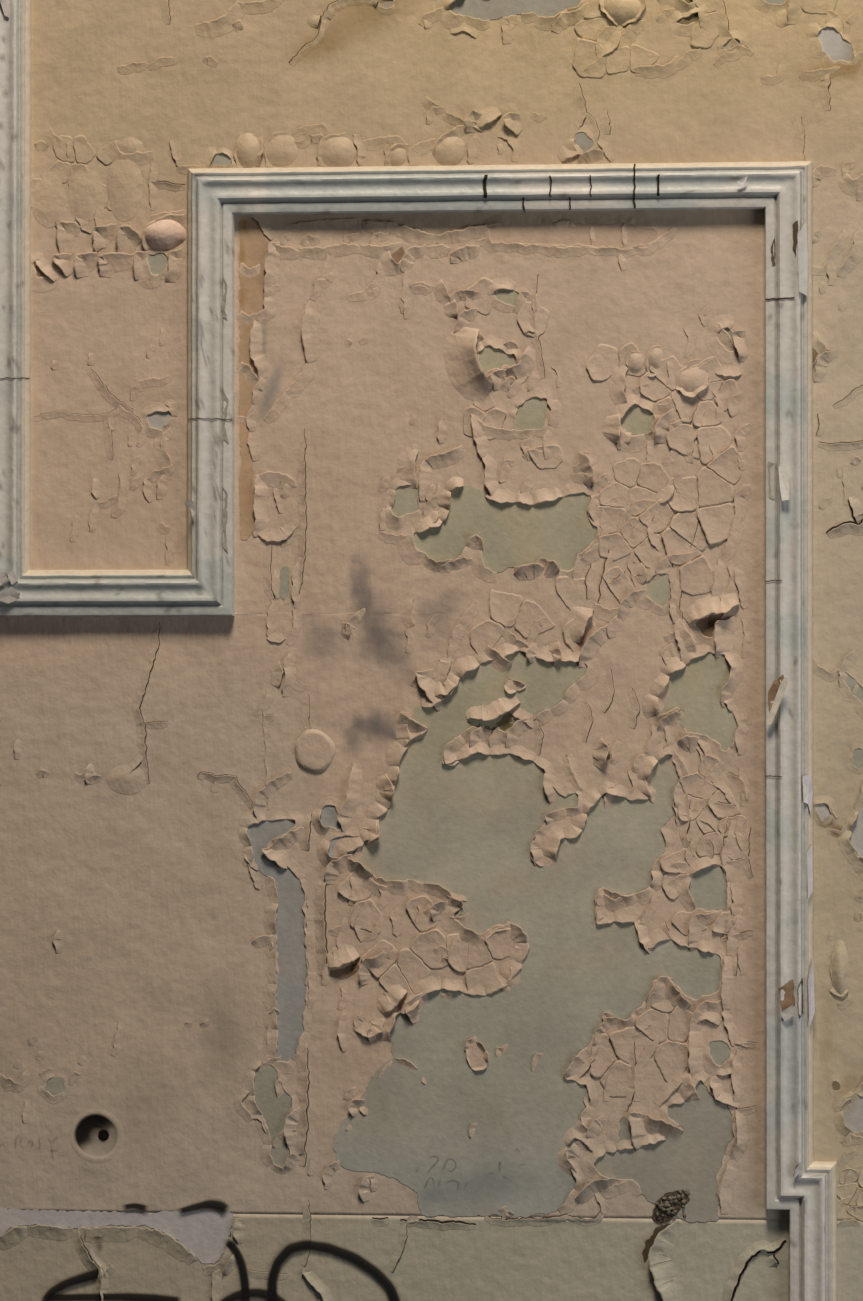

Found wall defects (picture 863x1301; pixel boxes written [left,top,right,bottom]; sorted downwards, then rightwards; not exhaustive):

crack [161,0,171,24]
peeling [419,0,754,78]
crack [34,367,145,460]
crack [816,385,863,451]
peeling [768,462,789,501]
crack [826,496,863,538]
peeling [0,570,20,604]
peeling [768,675,784,711]
peeling [221,212,752,1301]
peeling [803,743,863,902]
peeling [827,1074,863,1227]
peeling [0,1207,245,1301]